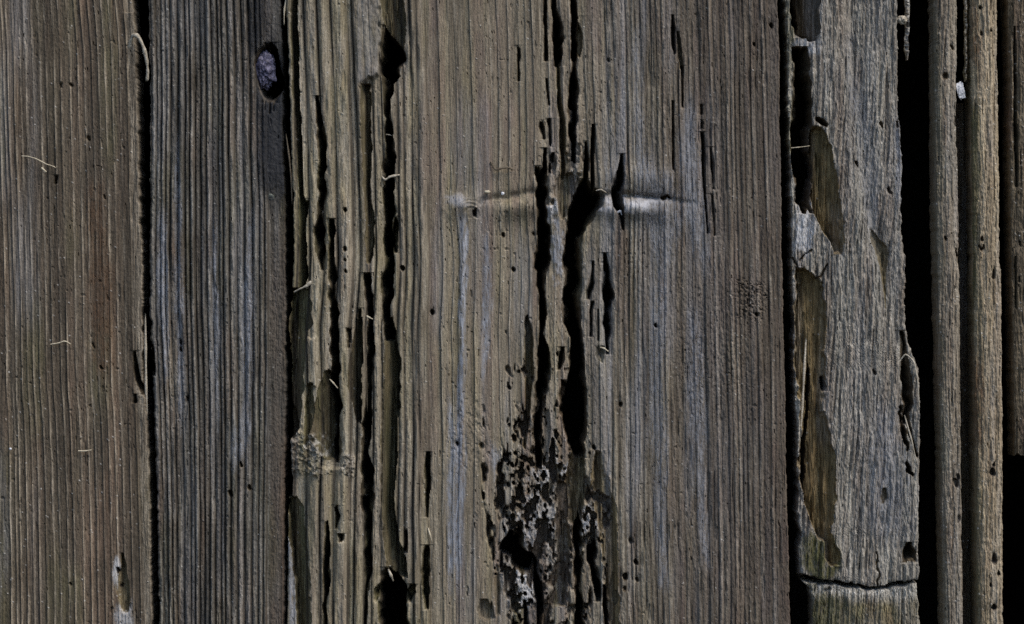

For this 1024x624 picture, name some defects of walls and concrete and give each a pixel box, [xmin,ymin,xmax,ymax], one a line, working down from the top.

crack [305,26,407,624]
crack [516,0,625,468]
crack [553,510,609,624]
crack [796,551,916,593]